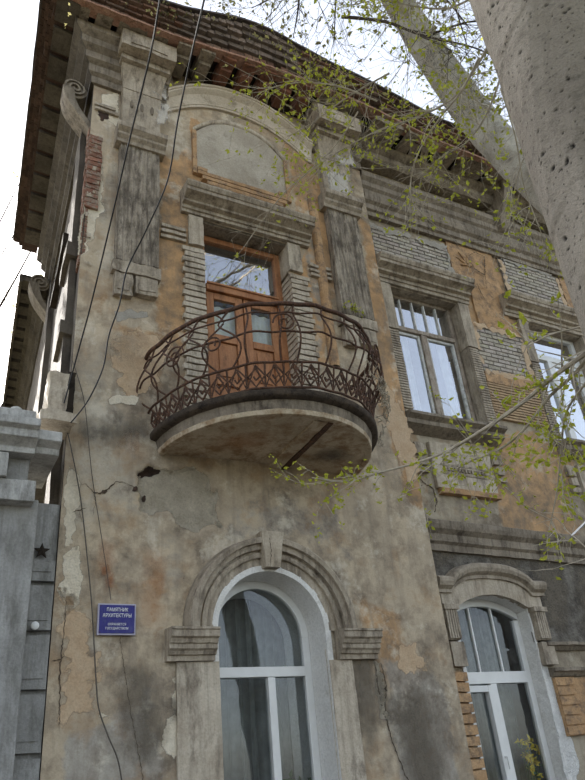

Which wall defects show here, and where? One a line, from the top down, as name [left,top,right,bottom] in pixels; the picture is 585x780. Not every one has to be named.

spalling [75,126,105,273]
crack [74,481,134,521]
spalling [132,466,223,533]
peeling [56,467,108,725]
crack [375,665,409,780]